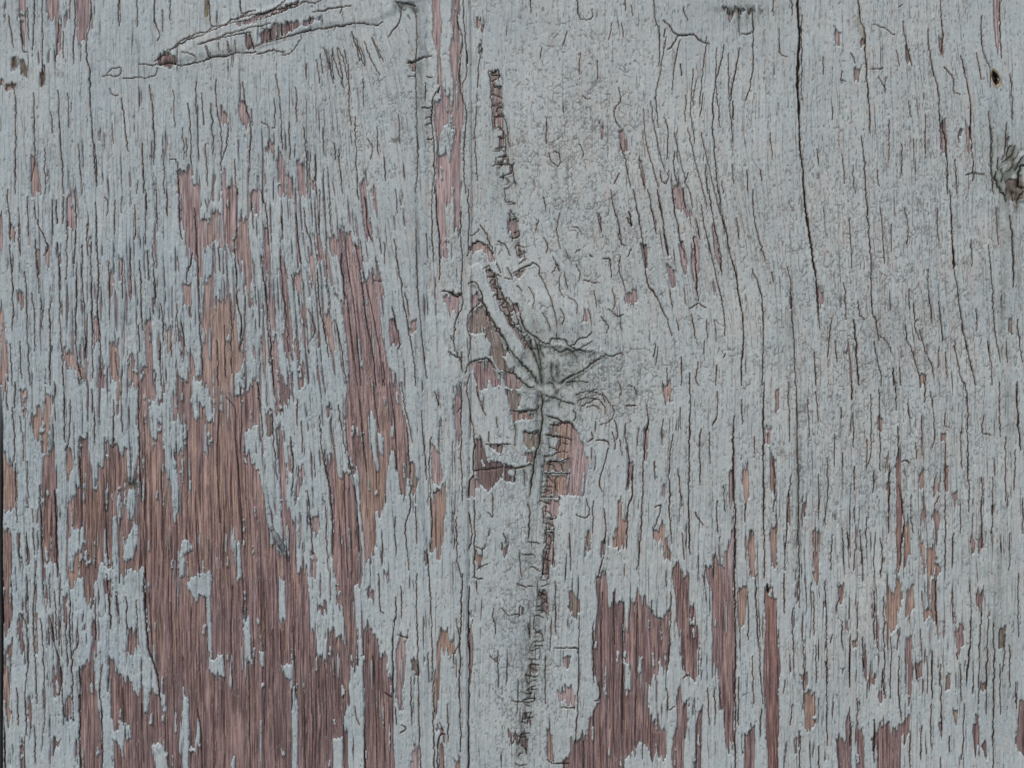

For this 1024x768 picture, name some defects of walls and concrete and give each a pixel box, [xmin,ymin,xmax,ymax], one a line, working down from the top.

crack [2,0,413,768]
peeling [0,71,595,768]
crack [251,0,902,768]
peeling [547,425,990,768]